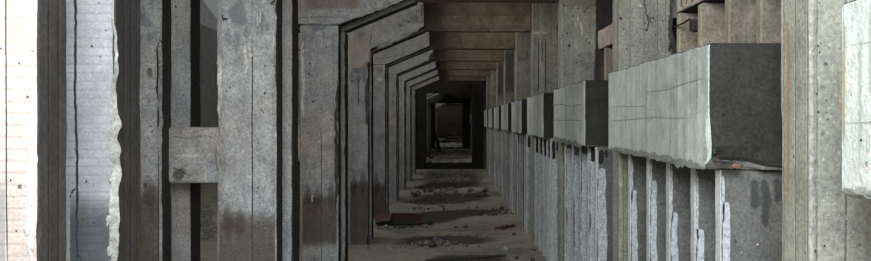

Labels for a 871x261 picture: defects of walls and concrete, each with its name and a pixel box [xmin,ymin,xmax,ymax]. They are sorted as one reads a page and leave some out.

spalling [24,0,38,261]
crack [71,0,79,213]
spalling [105,0,122,261]
crack [156,40,213,197]
crack [644,0,666,45]
spalling [842,187,871,199]